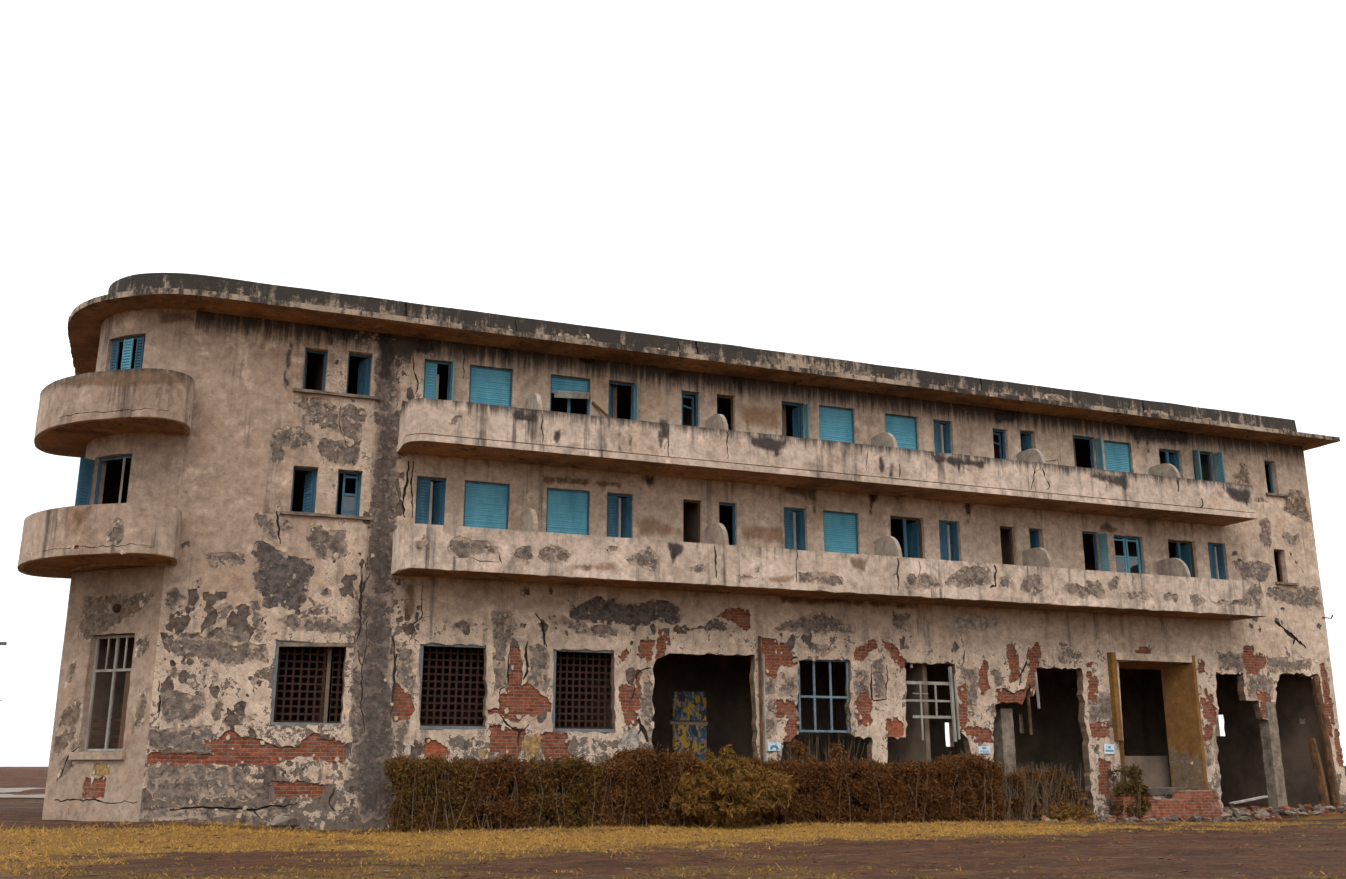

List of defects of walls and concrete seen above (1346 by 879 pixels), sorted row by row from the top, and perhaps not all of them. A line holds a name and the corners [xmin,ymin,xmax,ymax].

peeling [52,661,84,784]
peeling [77,357,912,824]
peeling [903,565,1043,596]
peeling [951,613,1113,798]
peeling [1061,462,1344,789]